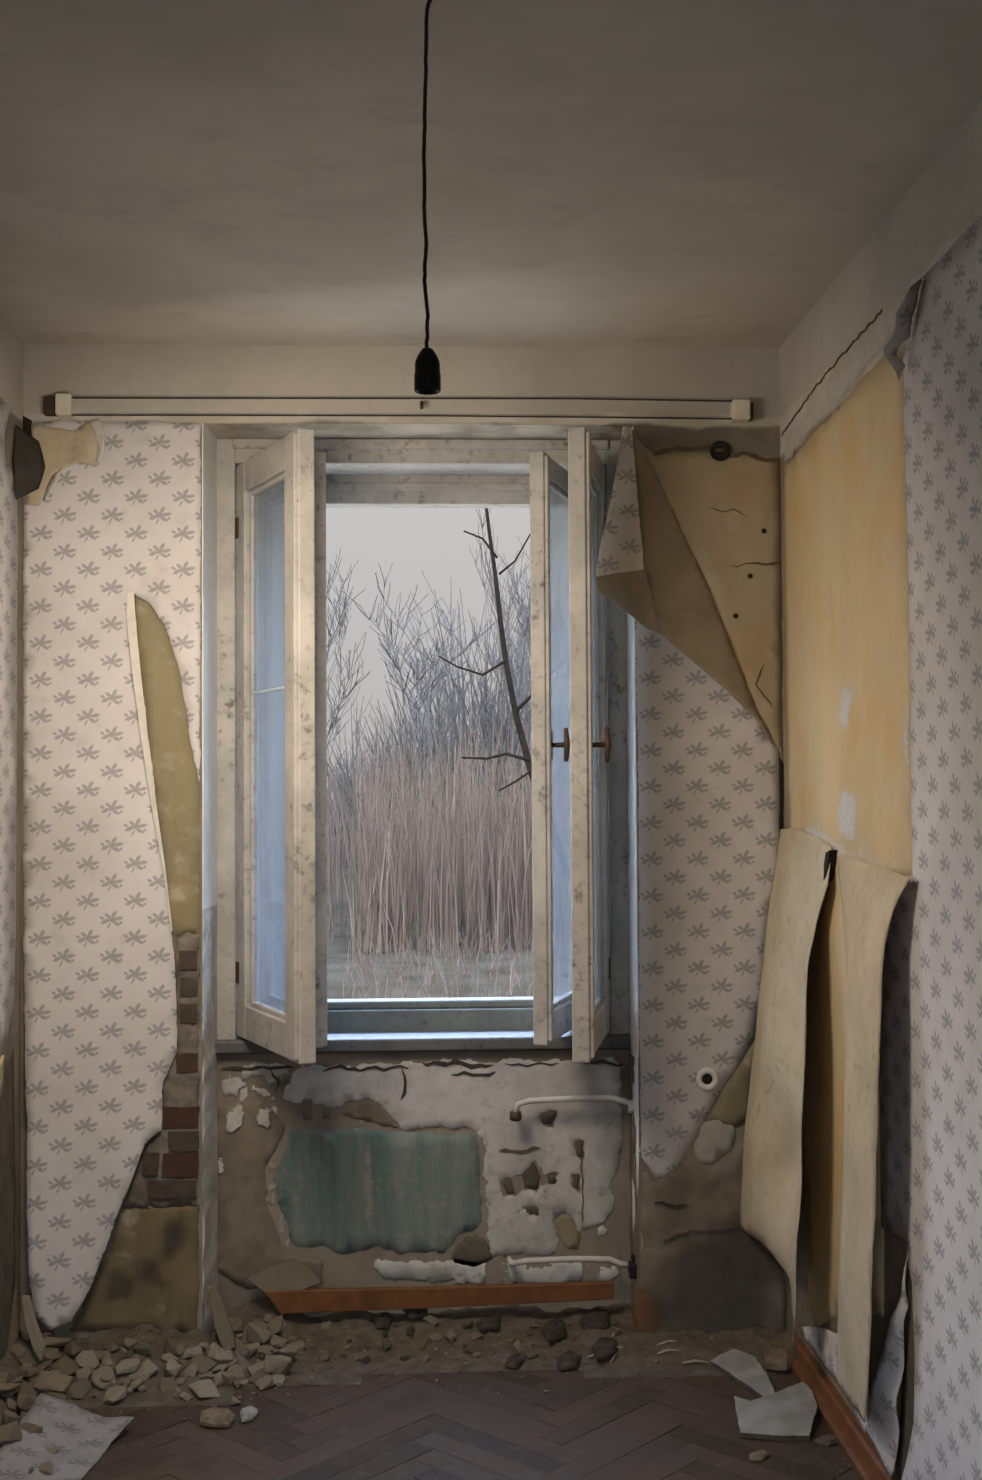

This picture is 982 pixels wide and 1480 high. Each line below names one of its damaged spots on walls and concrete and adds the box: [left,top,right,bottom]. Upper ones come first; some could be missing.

crack [653,309,883,462]
peeling [69,594,787,1335]
peeling [631,349,912,1326]